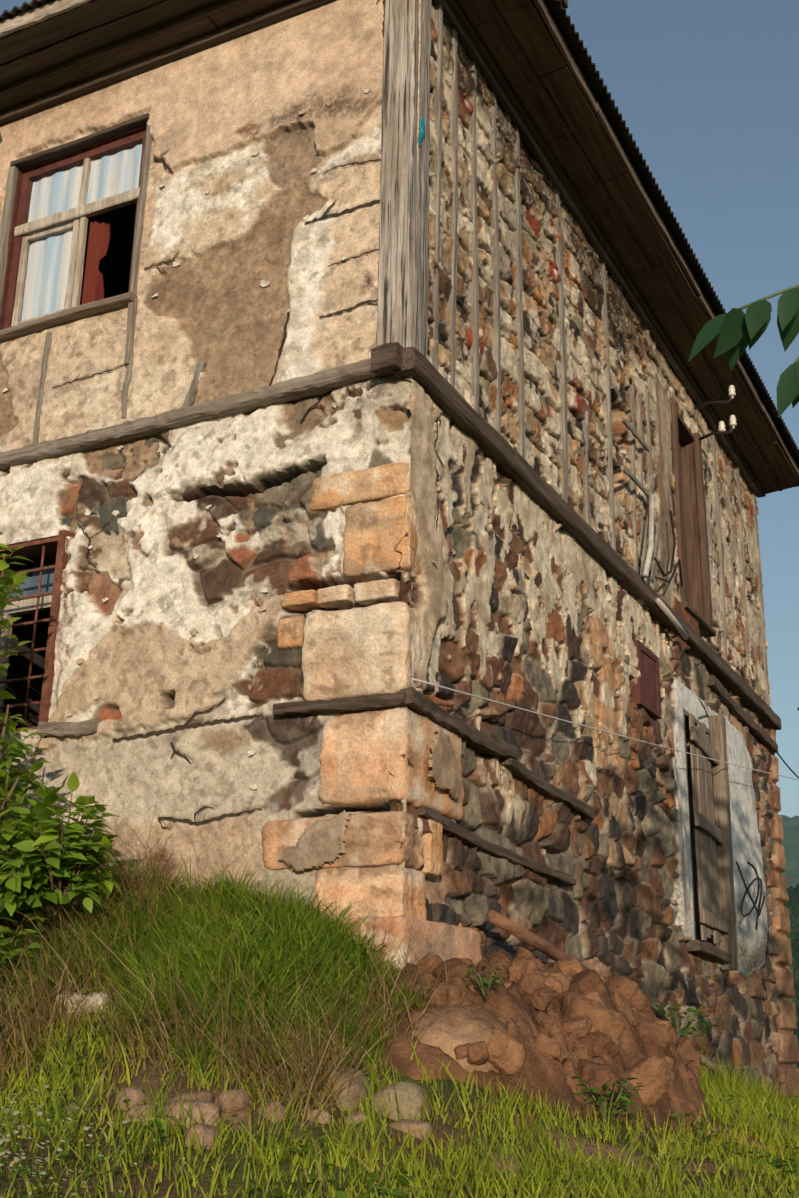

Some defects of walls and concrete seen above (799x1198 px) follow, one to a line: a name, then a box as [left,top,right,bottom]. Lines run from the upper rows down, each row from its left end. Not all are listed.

crack [153,150,172,173]
crack [305,159,381,224]
spalling [142,104,382,405]
crack [328,249,379,267]
spalling [0,354,18,437]
spalling [280,398,337,437]
corrosion [60,534,74,662]
spalling [35,432,380,814]
peeling [429,399,700,747]
crack [158,806,262,829]
peeling [483,756,534,830]
peeling [582,760,600,788]